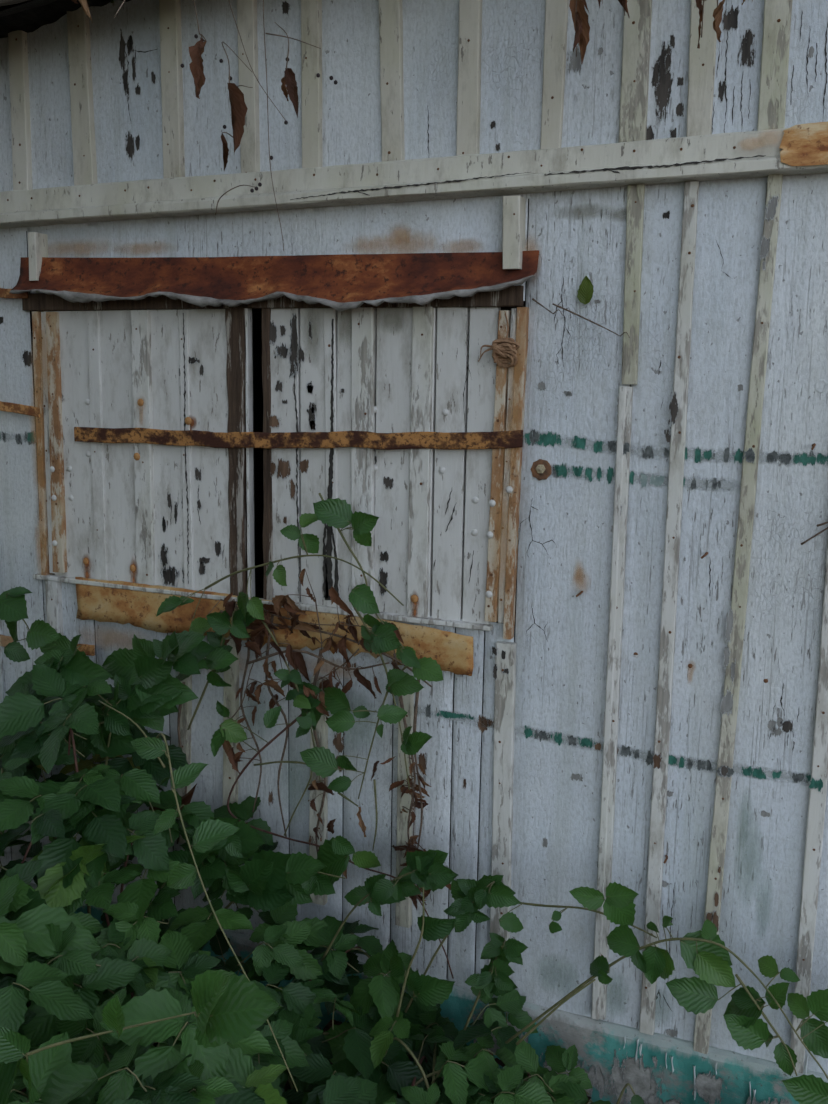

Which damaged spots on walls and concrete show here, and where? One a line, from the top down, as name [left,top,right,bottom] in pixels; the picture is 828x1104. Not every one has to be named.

peeling [119,29,156,102]
peeling [646,35,684,140]
peeling [721,5,756,71]
peeling [269,312,312,428]
peeling [271,458,309,500]
peeling [306,381,317,431]
peeling [552,462,615,484]
peeling [523,391,679,460]
peeling [685,445,828,466]
peeling [158,492,184,587]
peeling [197,541,221,575]
peeling [378,551,389,597]